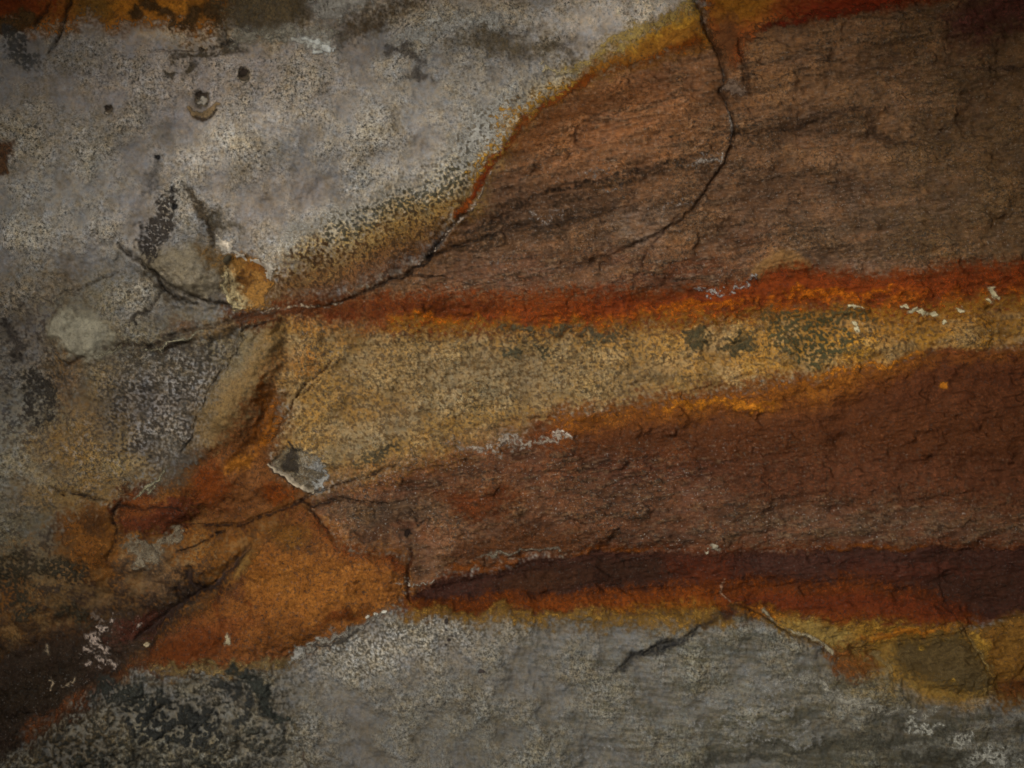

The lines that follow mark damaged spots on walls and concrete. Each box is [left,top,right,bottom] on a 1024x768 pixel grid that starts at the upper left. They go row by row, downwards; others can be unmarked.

rust [0,0,232,39]
rust [224,0,1024,334]
crack [58,491,181,552]
crack [142,465,393,634]
spalling [267,441,329,494]
rust [0,375,1024,762]
rust [524,346,1024,478]
crack [619,609,818,672]